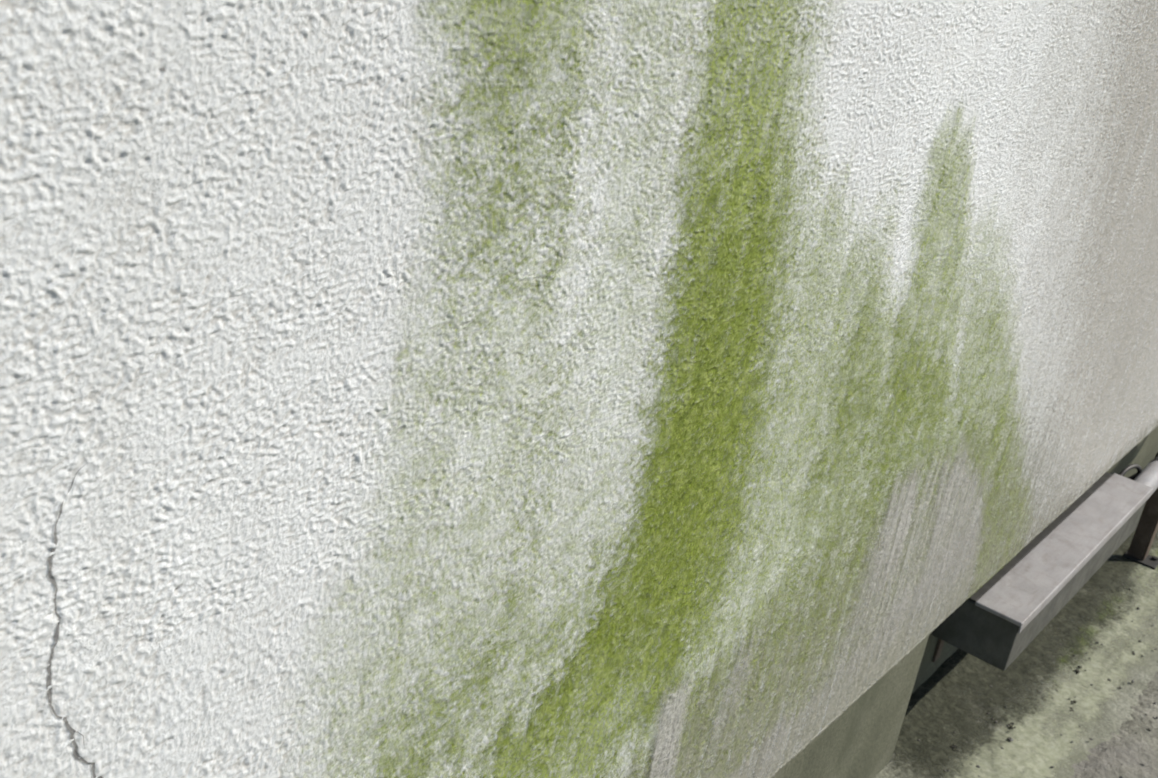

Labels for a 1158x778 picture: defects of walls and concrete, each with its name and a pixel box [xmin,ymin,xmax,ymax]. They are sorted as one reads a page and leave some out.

crack [47,467,103,778]
water stain [329,0,1158,778]